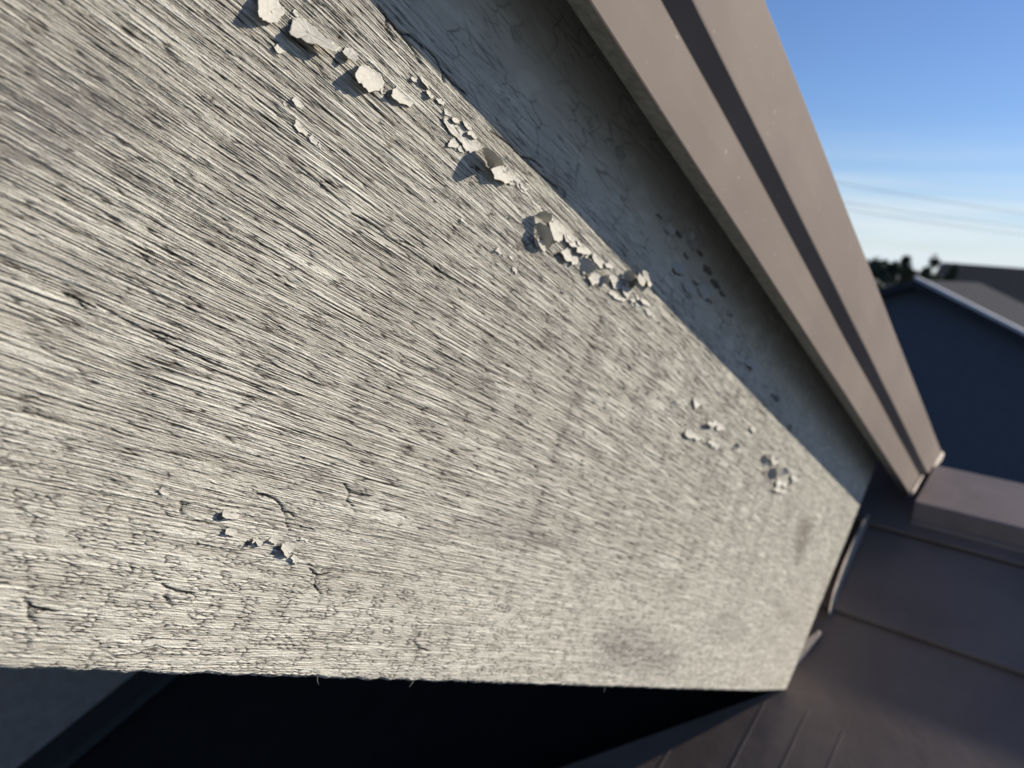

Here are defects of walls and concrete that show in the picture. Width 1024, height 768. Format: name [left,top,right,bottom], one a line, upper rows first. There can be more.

peeling [258,0,413,108]
crack [380,11,465,94]
peeling [283,96,322,150]
crack [491,132,555,187]
peeling [410,77,656,317]
peeling [669,397,725,449]
peeling [215,510,309,564]